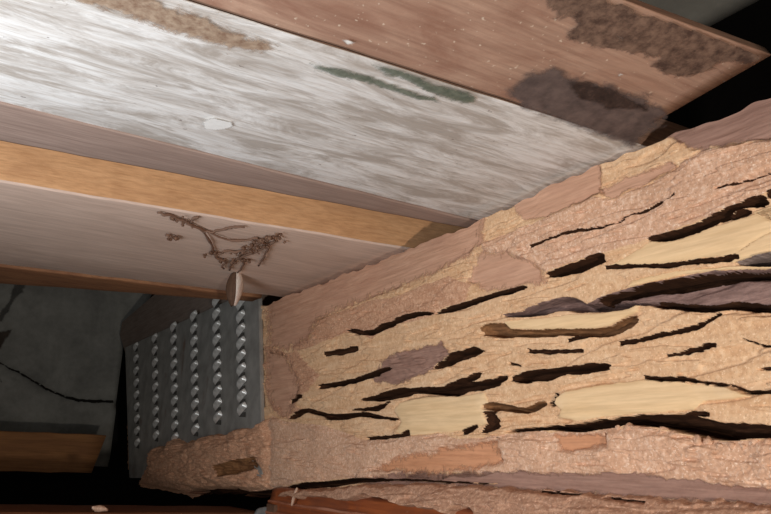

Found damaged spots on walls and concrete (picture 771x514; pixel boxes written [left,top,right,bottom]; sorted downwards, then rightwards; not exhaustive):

leakage [316,67,474,103]
leakage [508,67,667,148]
crack [530,193,675,248]
crack [648,173,771,242]
crack [546,253,739,278]
crack [324,285,527,357]
crack [527,336,596,355]
crack [619,312,722,357]
crack [0,362,114,403]
crack [289,367,410,440]
crack [462,393,559,438]
crack [542,488,584,496]